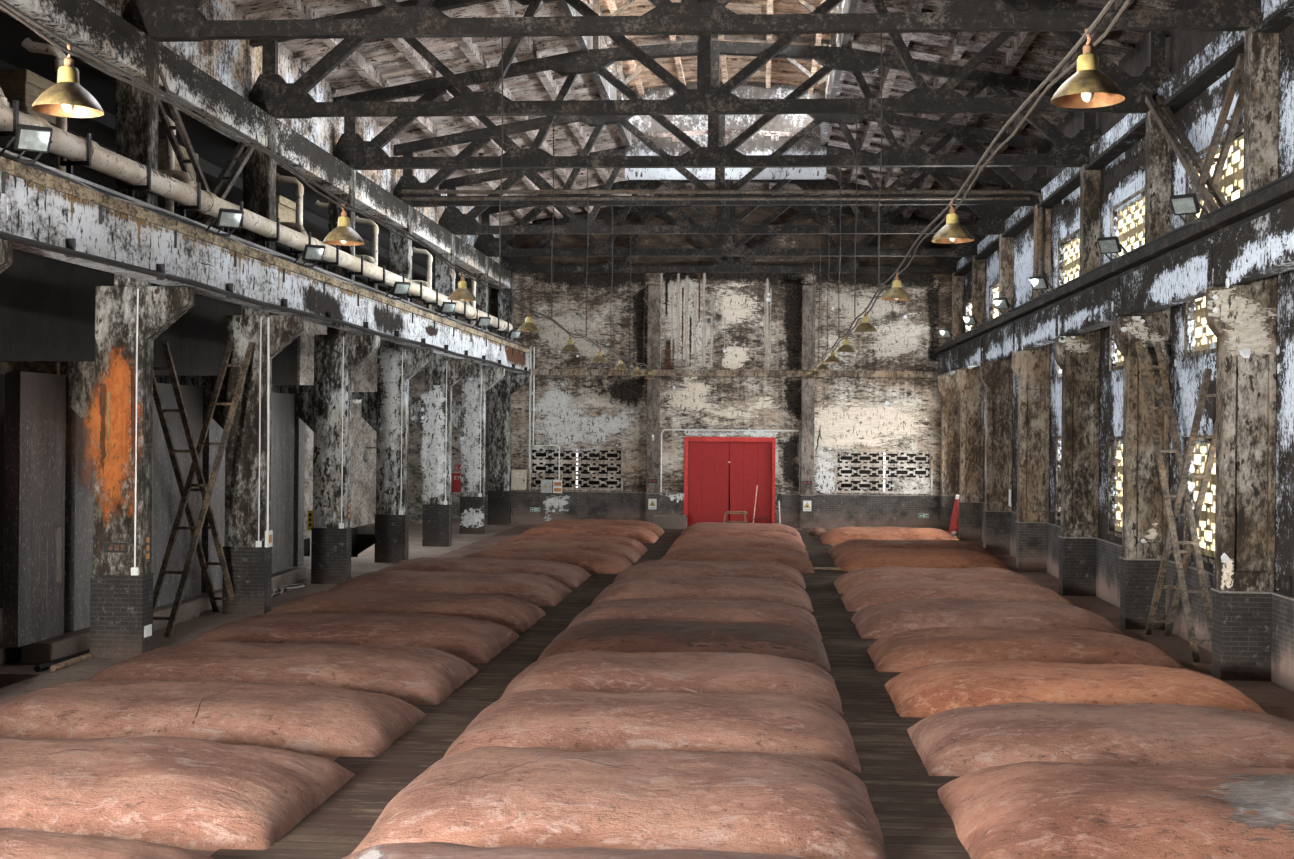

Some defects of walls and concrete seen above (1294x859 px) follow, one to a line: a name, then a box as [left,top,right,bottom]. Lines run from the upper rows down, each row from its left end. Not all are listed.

flaking render [1172,68,1239,195]
flaking render [1279,60,1294,176]
rust [84,349,141,522]
flaking render [378,346,404,450]
flaking render [420,377,484,528]
flaking render [660,377,779,437]
leakage [532,264,941,490]
flaking render [814,399,932,494]
flaking render [965,229,1294,453]